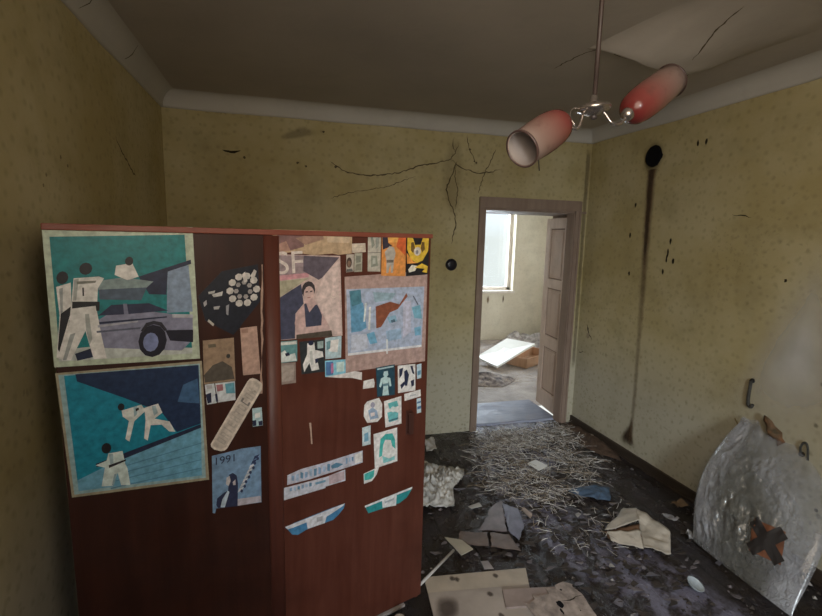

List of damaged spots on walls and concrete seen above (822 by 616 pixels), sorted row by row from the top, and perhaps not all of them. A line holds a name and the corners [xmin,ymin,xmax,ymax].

crack [687,8,742,76]
crack [331,138,500,244]